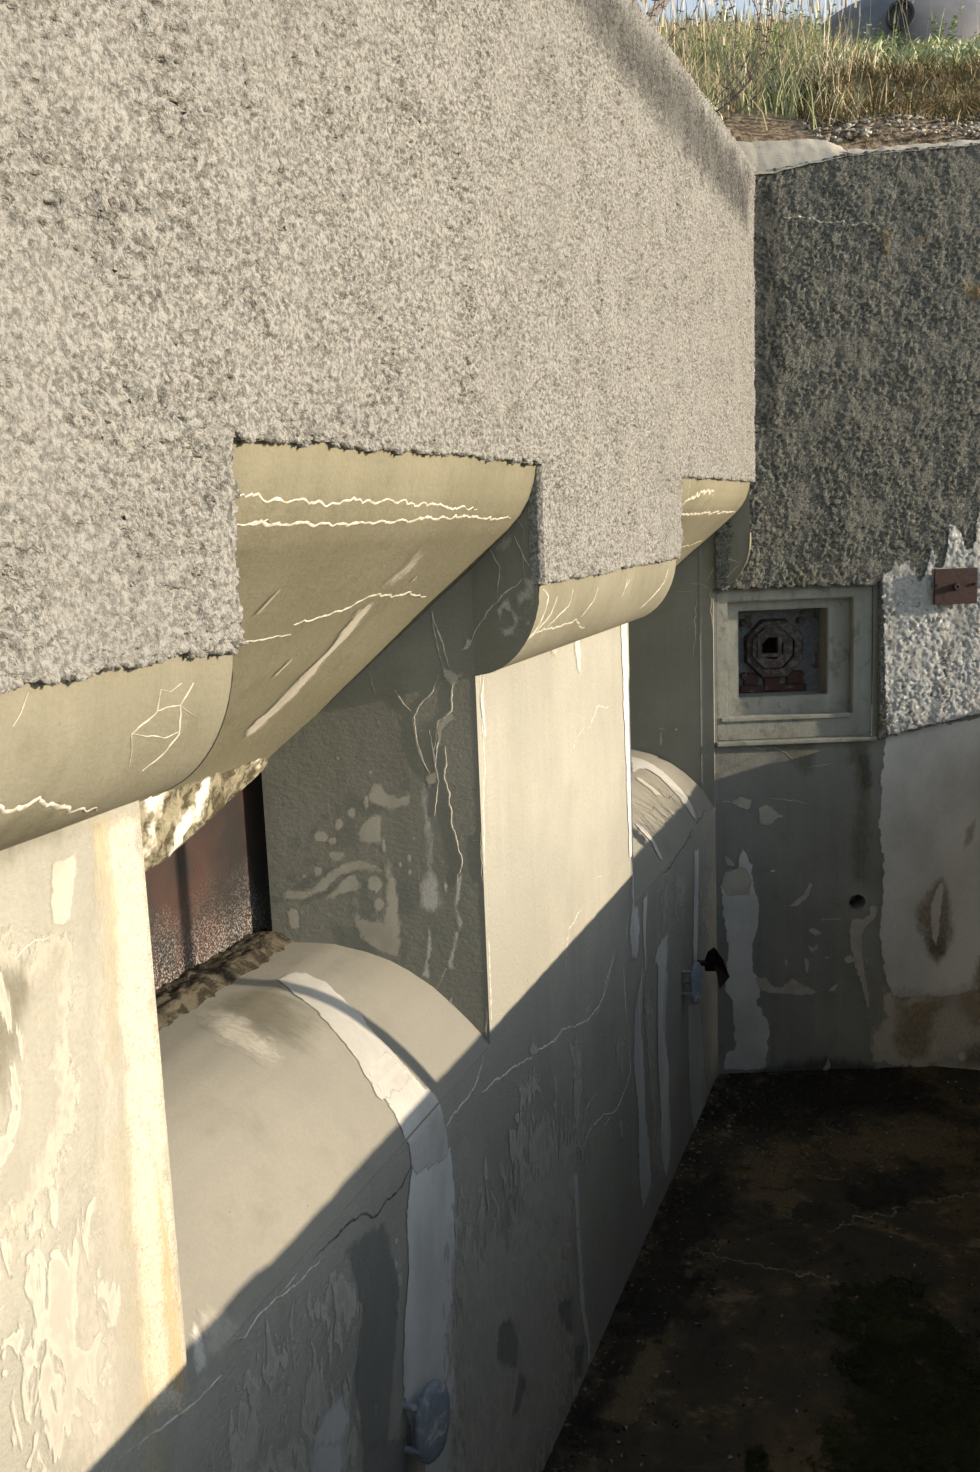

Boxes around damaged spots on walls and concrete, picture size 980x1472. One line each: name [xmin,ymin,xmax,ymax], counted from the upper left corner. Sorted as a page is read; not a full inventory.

crack [0,796,98,814]
crack [128,683,194,771]
peeling [284,770,415,956]
crack [237,479,745,883]
water stain [764,905,980,1073]
crack [118,1375,222,1459]
water stain [309,1225,408,1472]